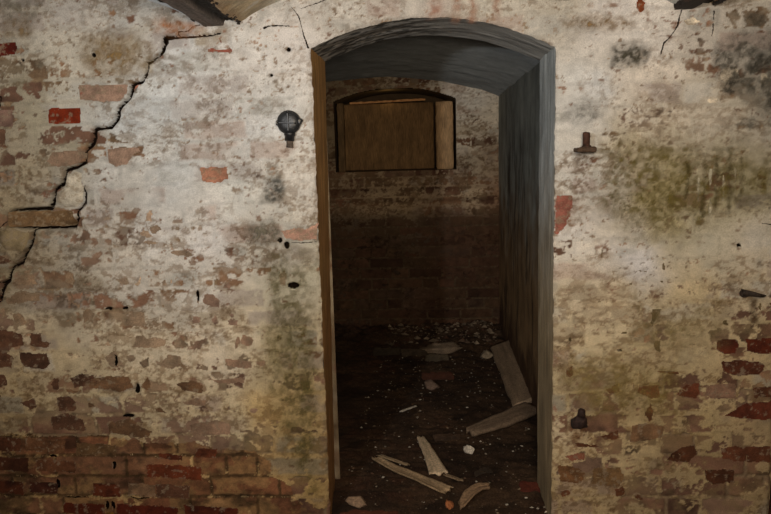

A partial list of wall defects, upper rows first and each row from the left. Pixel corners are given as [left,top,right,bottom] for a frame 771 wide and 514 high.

crack [263,0,324,48]
crack [660,10,682,55]
flaking render [48,84,141,124]
crack [0,25,221,302]
flaking render [108,147,140,167]
flaking render [200,166,228,183]
damp [604,147,747,220]
peeling [0,269,51,397]
peeling [0,311,301,514]
flaking render [676,338,771,420]
flaking render [558,430,625,497]
flaking render [705,446,771,485]